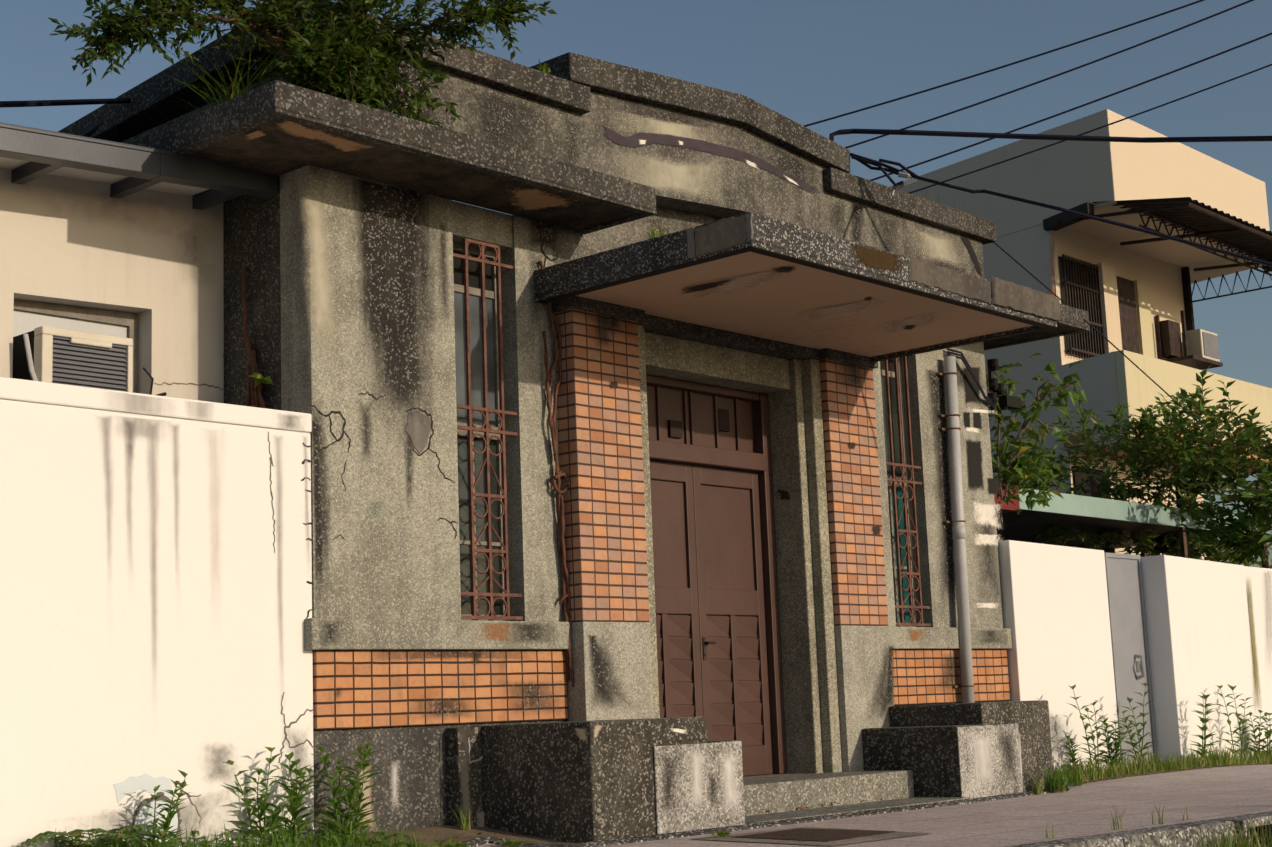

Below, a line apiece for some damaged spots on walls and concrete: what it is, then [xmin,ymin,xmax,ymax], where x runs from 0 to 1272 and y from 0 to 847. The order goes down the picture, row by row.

flaking render [246,130,266,140]
flaking render [280,121,372,152]
damp [362,181,446,401]
crack [268,392,386,553]
damp [590,636,617,698]
crack [279,693,316,763]